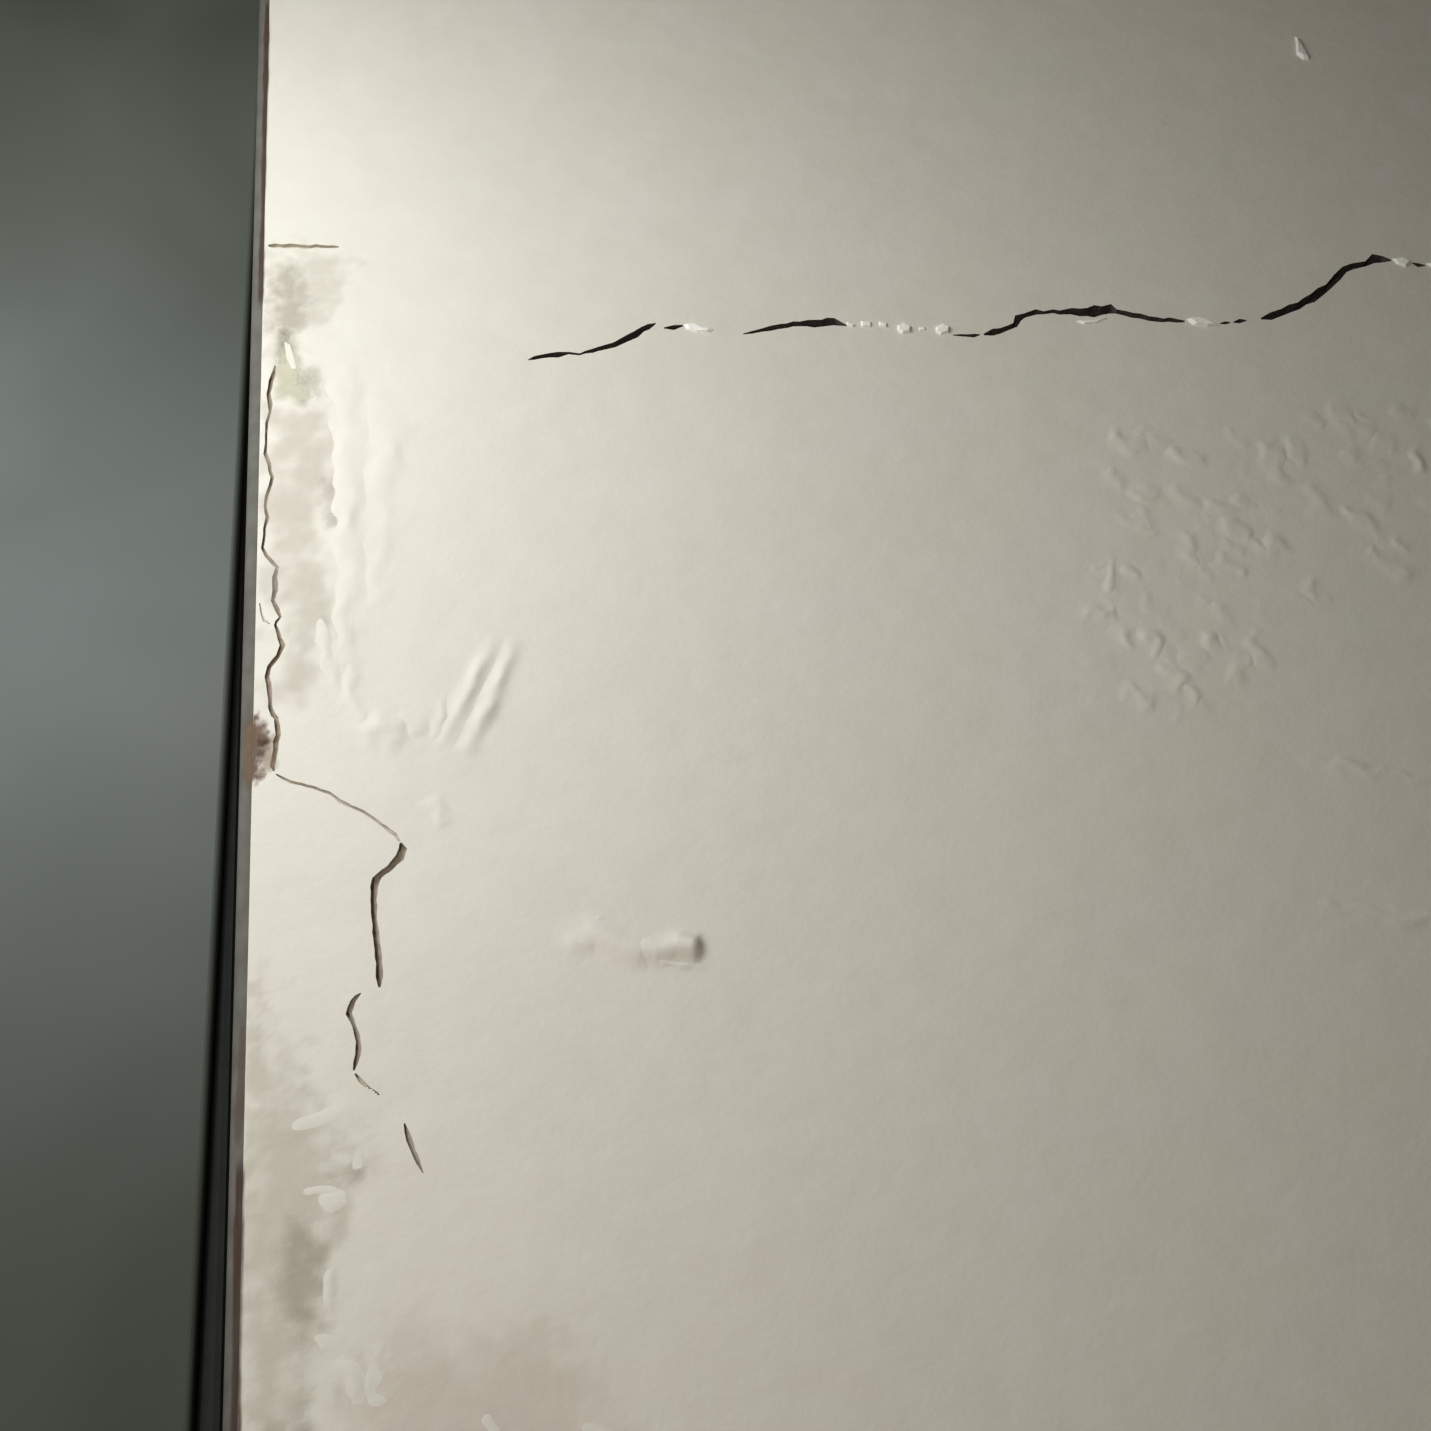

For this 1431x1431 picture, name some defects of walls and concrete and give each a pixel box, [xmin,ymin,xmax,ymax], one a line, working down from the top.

crack [528,254,1431,360]
rust [243,715,271,783]
crack [259,365,407,1095]
crack [404,1123,423,1173]